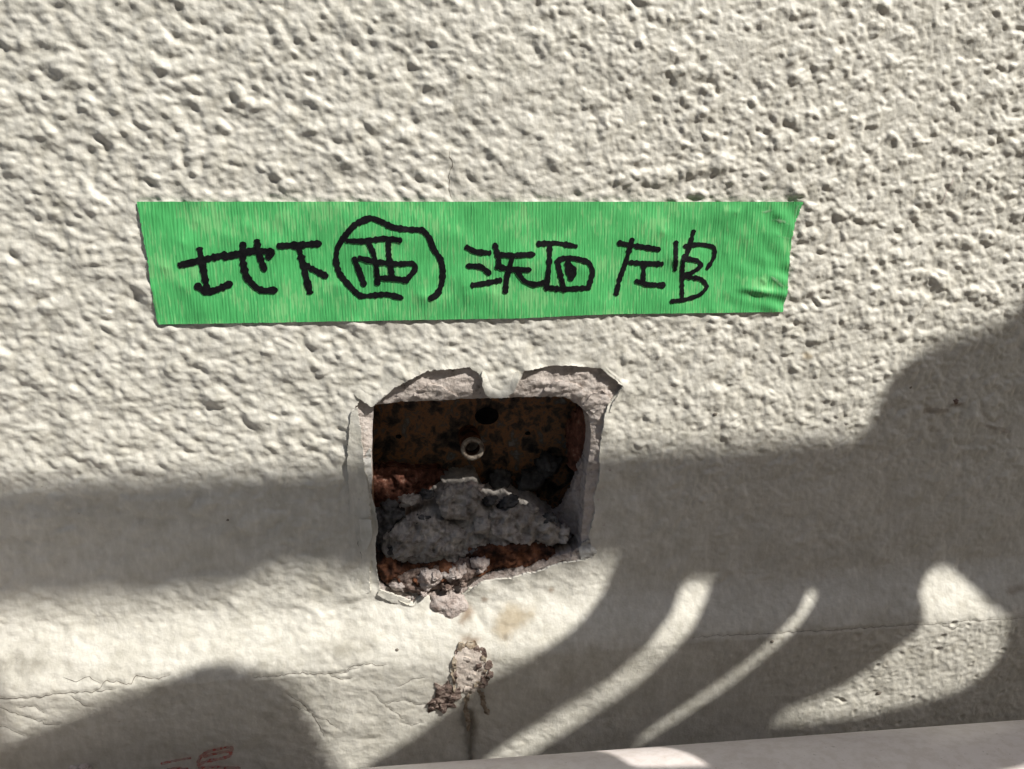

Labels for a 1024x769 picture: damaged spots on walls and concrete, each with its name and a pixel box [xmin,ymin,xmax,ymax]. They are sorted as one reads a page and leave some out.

spalling [347,365,629,604]
crack [0,675,165,735]
crack [253,663,425,736]
peeling [427,640,494,731]